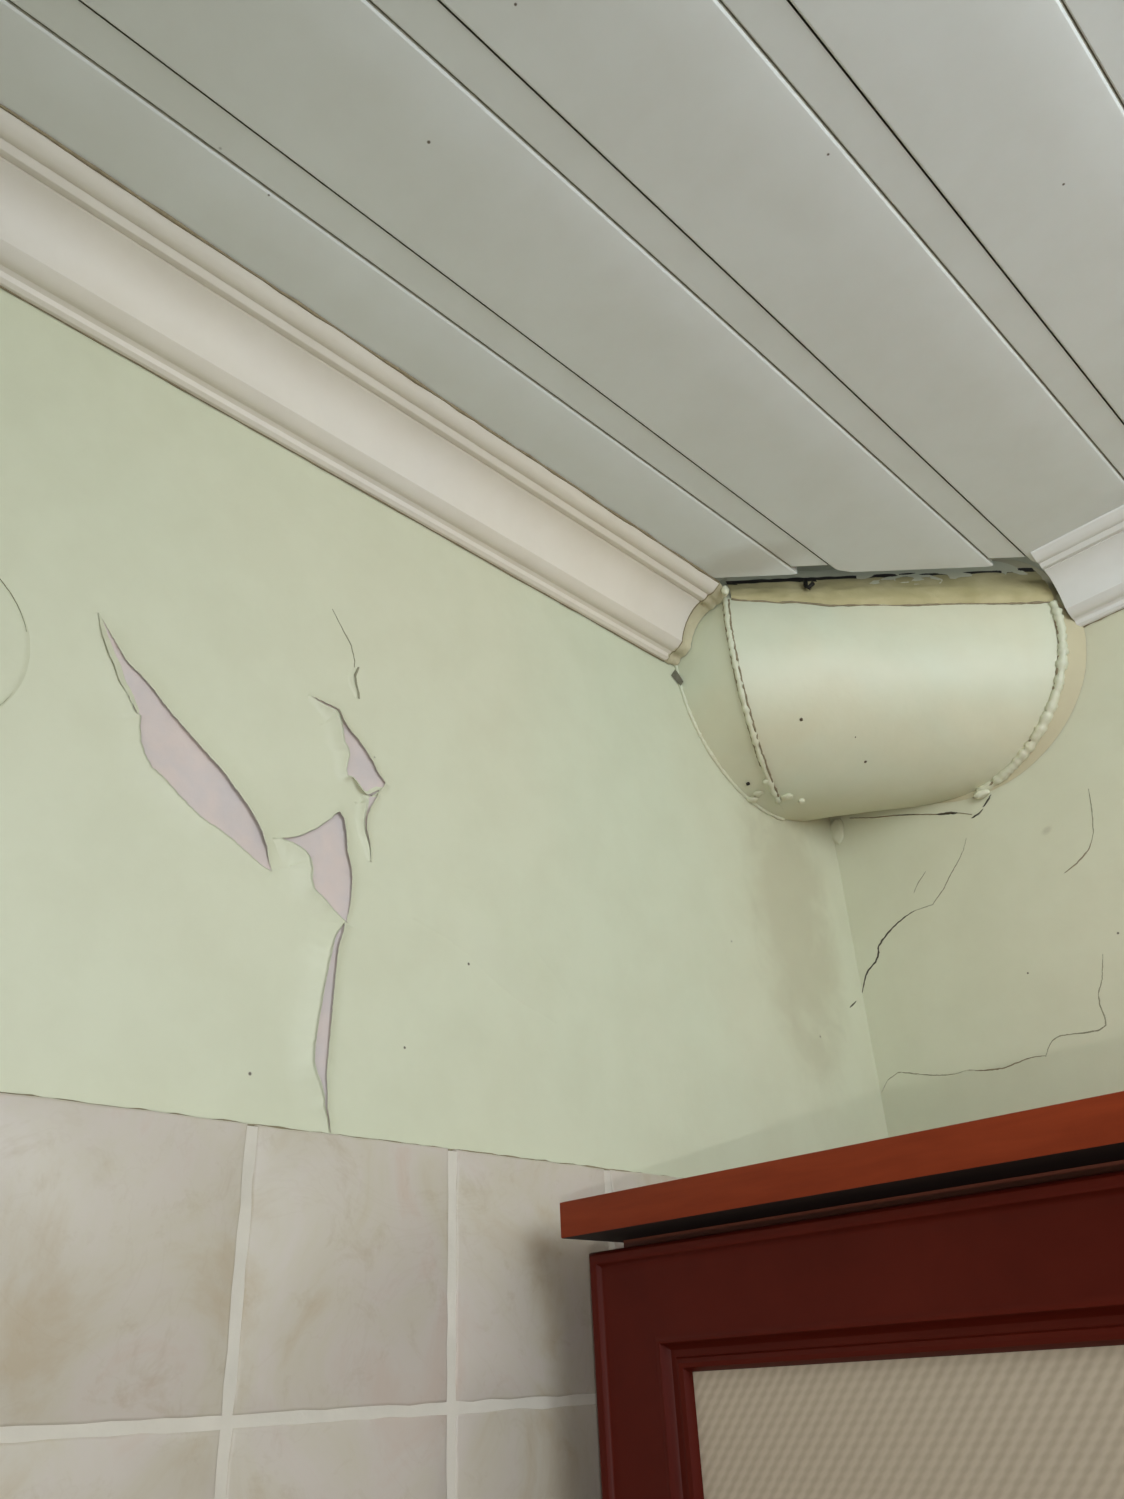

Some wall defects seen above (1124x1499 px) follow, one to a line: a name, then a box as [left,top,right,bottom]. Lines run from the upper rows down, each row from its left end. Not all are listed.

crack [1064,789,1094,873]
crack [850,795,991,1008]
crack [882,954,1106,1091]